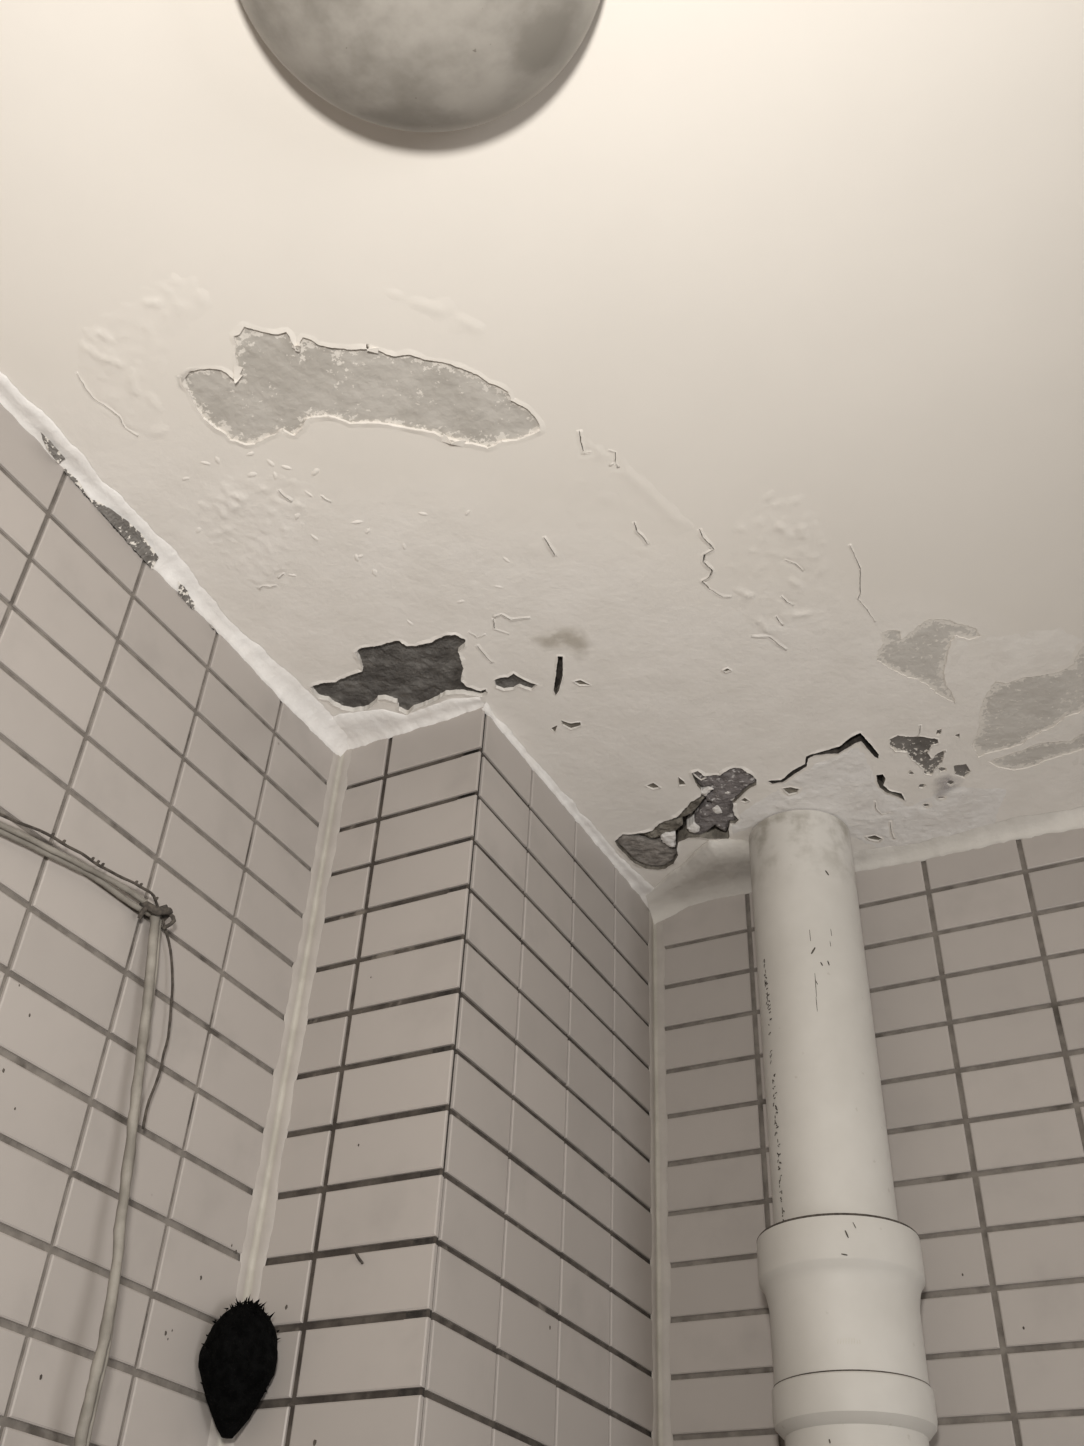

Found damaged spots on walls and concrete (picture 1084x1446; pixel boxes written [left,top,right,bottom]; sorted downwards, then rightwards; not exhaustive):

peeling [177,321,545,452]
flaking render [307,632,540,715]
peeling [877,619,981,703]
peeling [888,646,1084,808]
flaking render [612,766,759,871]
crack [766,731,906,839]